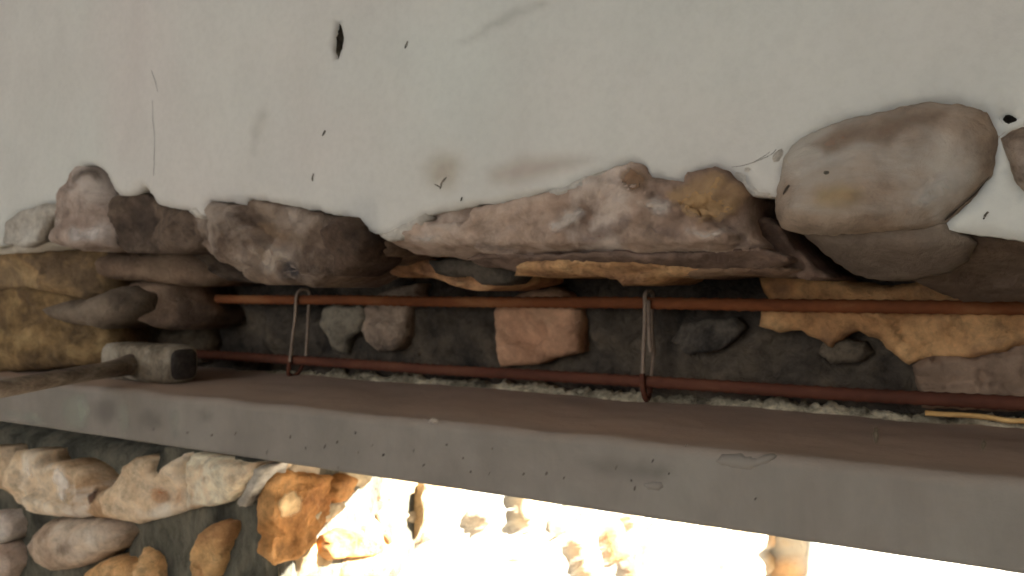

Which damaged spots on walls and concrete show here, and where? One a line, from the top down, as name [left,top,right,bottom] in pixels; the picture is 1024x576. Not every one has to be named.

hole [336,20,344,57]
spalling [734,167,776,200]
spalling [3,203,56,248]
spalling [379,213,438,242]
spalling [214,294,1024,316]
spalling [196,350,1024,411]